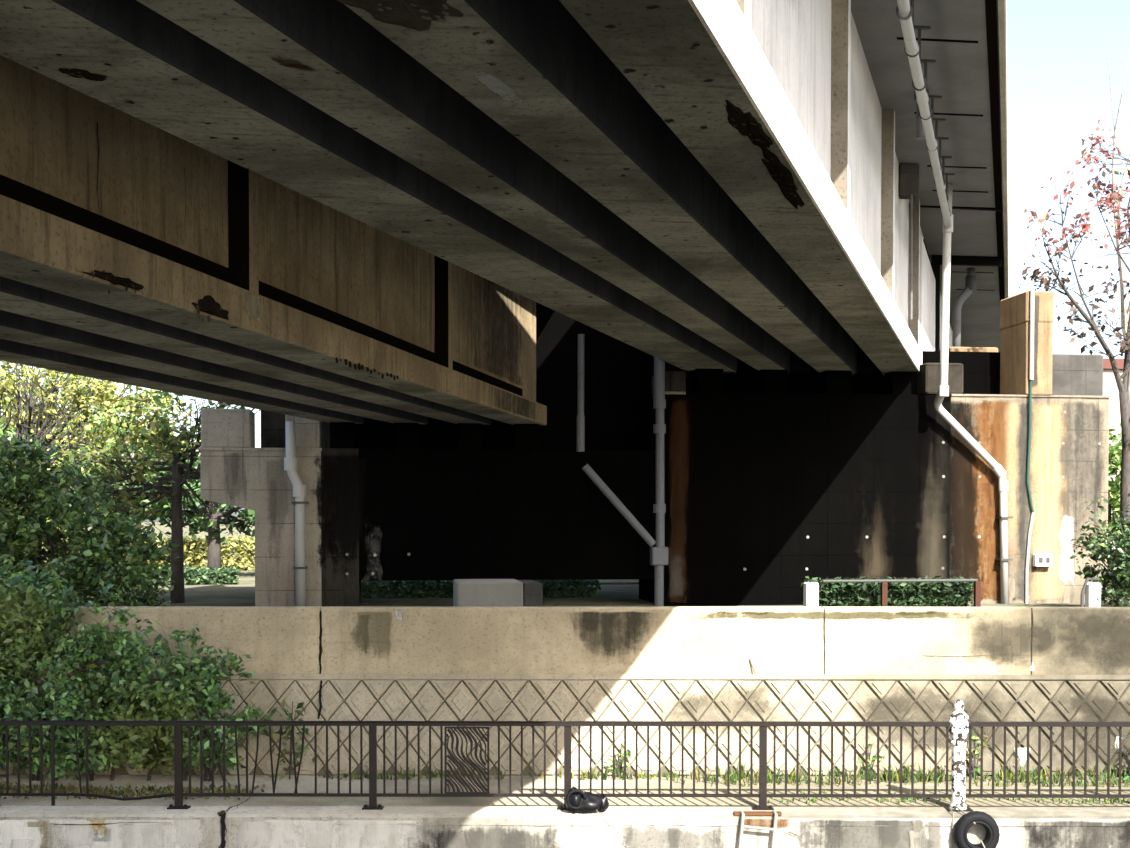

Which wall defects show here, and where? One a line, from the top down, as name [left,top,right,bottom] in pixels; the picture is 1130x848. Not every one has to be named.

spalling [337,0,464,31]
spalling [725,100,805,209]
spalling [79,270,144,294]
spalling [191,295,229,322]
corrosion [670,400,689,603]
corrosion [950,401,1010,601]
leakage [1006,404,1066,600]
leakage [580,612,649,654]
leakage [708,611,949,620]
crack [317,611,325,719]
leakage [417,827,555,848]
leakage [803,820,926,848]